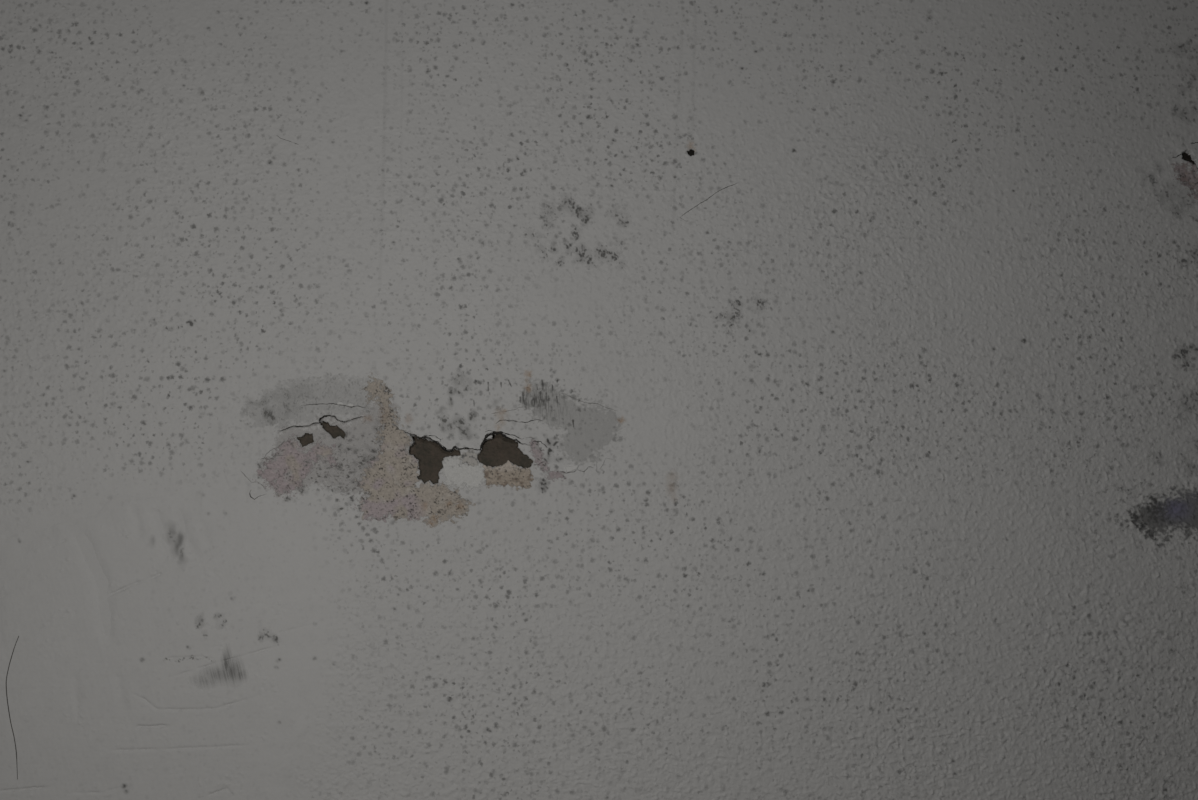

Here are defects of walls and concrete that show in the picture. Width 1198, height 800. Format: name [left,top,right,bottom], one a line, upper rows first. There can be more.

peeling [1172,150,1198,200]
peeling [257,377,579,527]
damp [1120,488,1198,546]